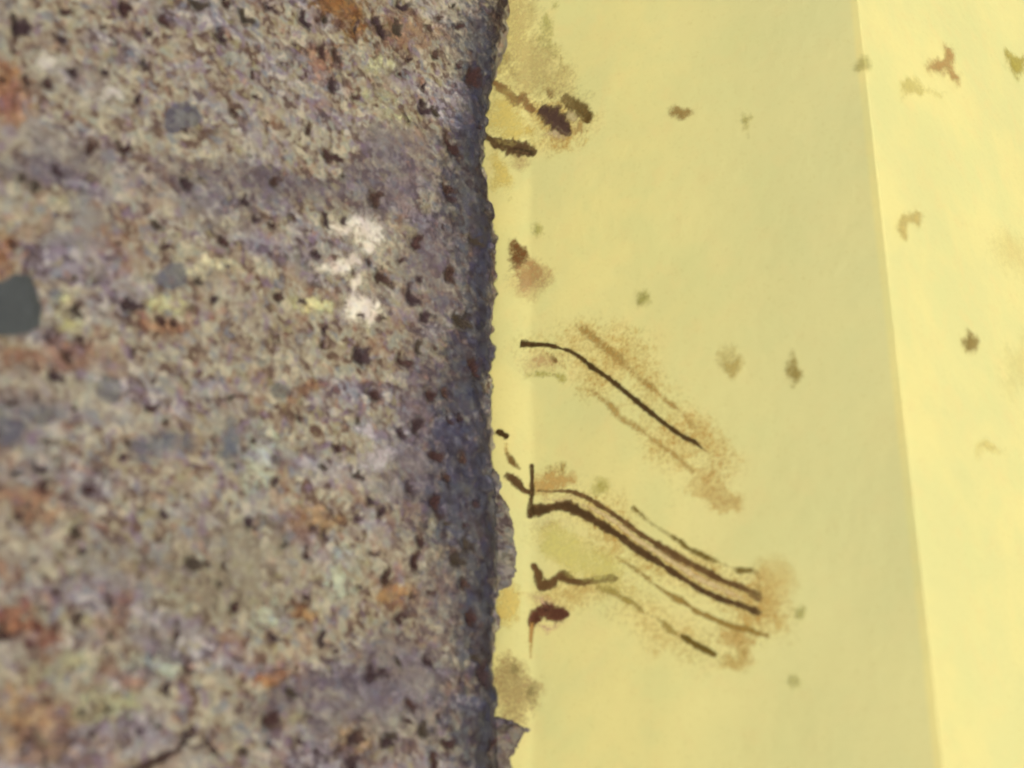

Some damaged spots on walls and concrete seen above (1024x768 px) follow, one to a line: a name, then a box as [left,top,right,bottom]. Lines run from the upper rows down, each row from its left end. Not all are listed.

water stain [292,208,387,330]
rust [509,240,549,290]